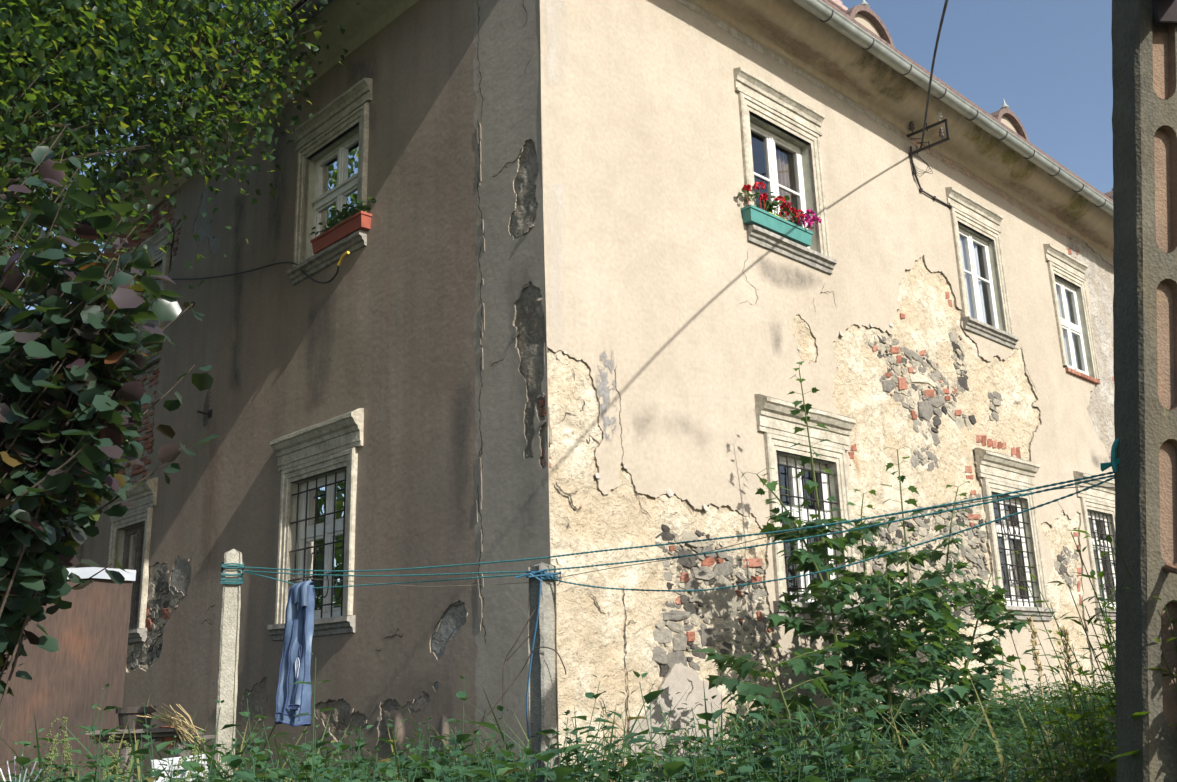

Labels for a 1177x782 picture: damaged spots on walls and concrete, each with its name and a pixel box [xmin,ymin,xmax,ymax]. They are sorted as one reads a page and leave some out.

flaking render [508,139,539,240]
crack [432,8,522,644]
flaking render [792,314,818,364]
flaking render [126,556,191,673]
flaking render [429,600,468,660]
flaking render [513,282,787,781]
flaking render [832,255,1042,733]
flaking render [1041,510,1096,705]